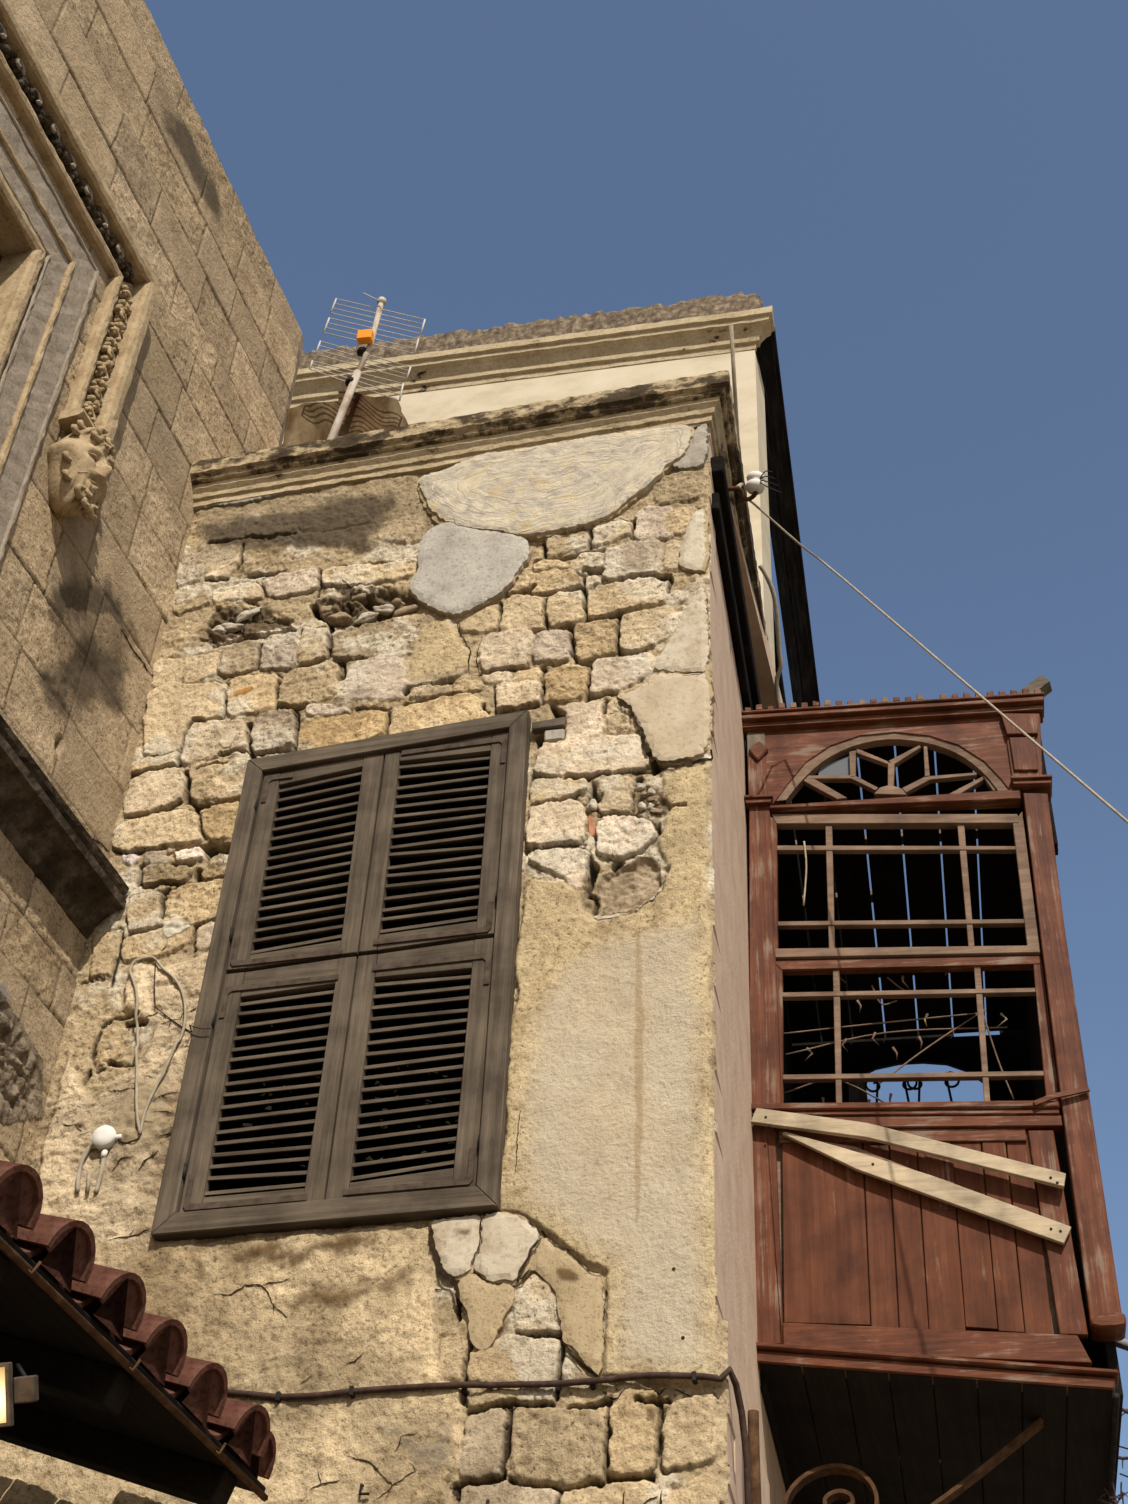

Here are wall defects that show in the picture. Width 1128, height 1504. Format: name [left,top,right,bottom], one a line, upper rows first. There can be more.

spalling [208,606,289,645]
spalling [315,589,420,628]
peeling [618,509,715,770]
crack [616,696,713,775]
spalling [635,783,668,816]
crack [214,1279,288,1318]
peeling [431,1212,605,1377]
crack [311,1433,416,1499]